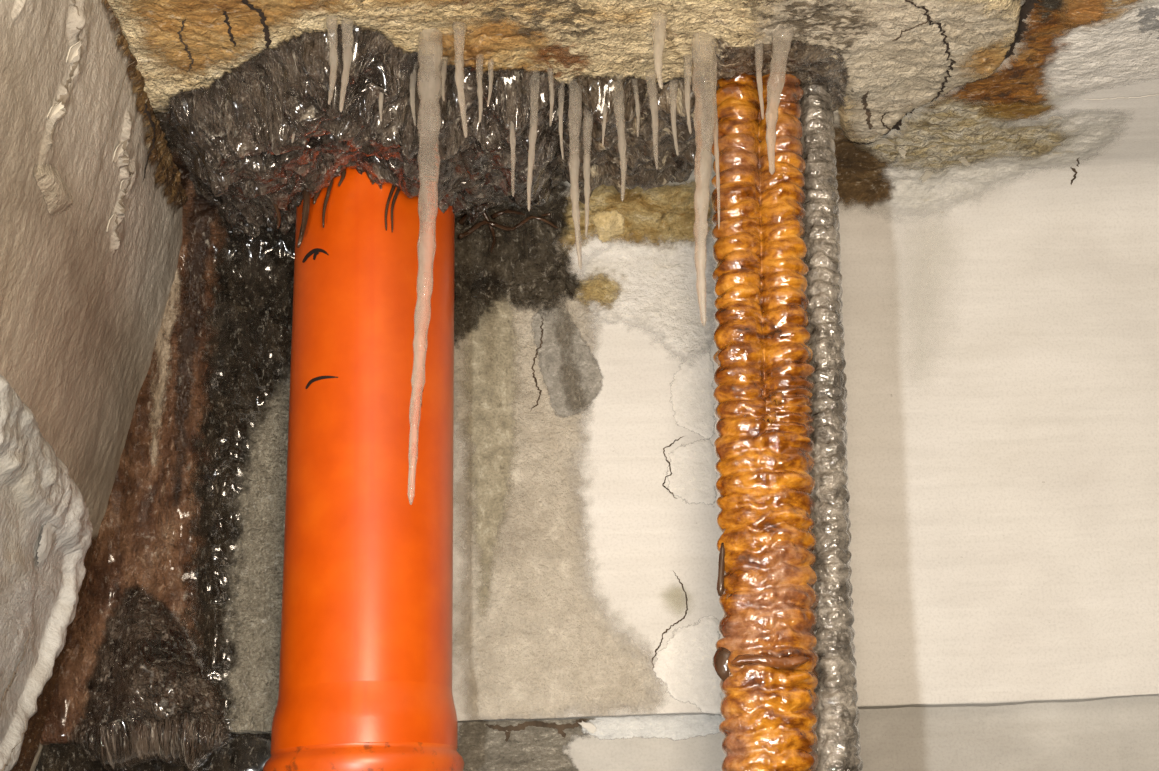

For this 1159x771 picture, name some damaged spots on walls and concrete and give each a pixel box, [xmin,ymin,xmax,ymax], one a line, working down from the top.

crack [177,18,194,72]
crack [222,0,272,48]
spalling [107,0,1066,171]
crack [848,0,976,145]
crack [1004,0,1039,60]
rust [928,0,1138,124]
peeling [106,137,134,242]
water stain [438,64,716,411]
water stain [10,24,420,771]